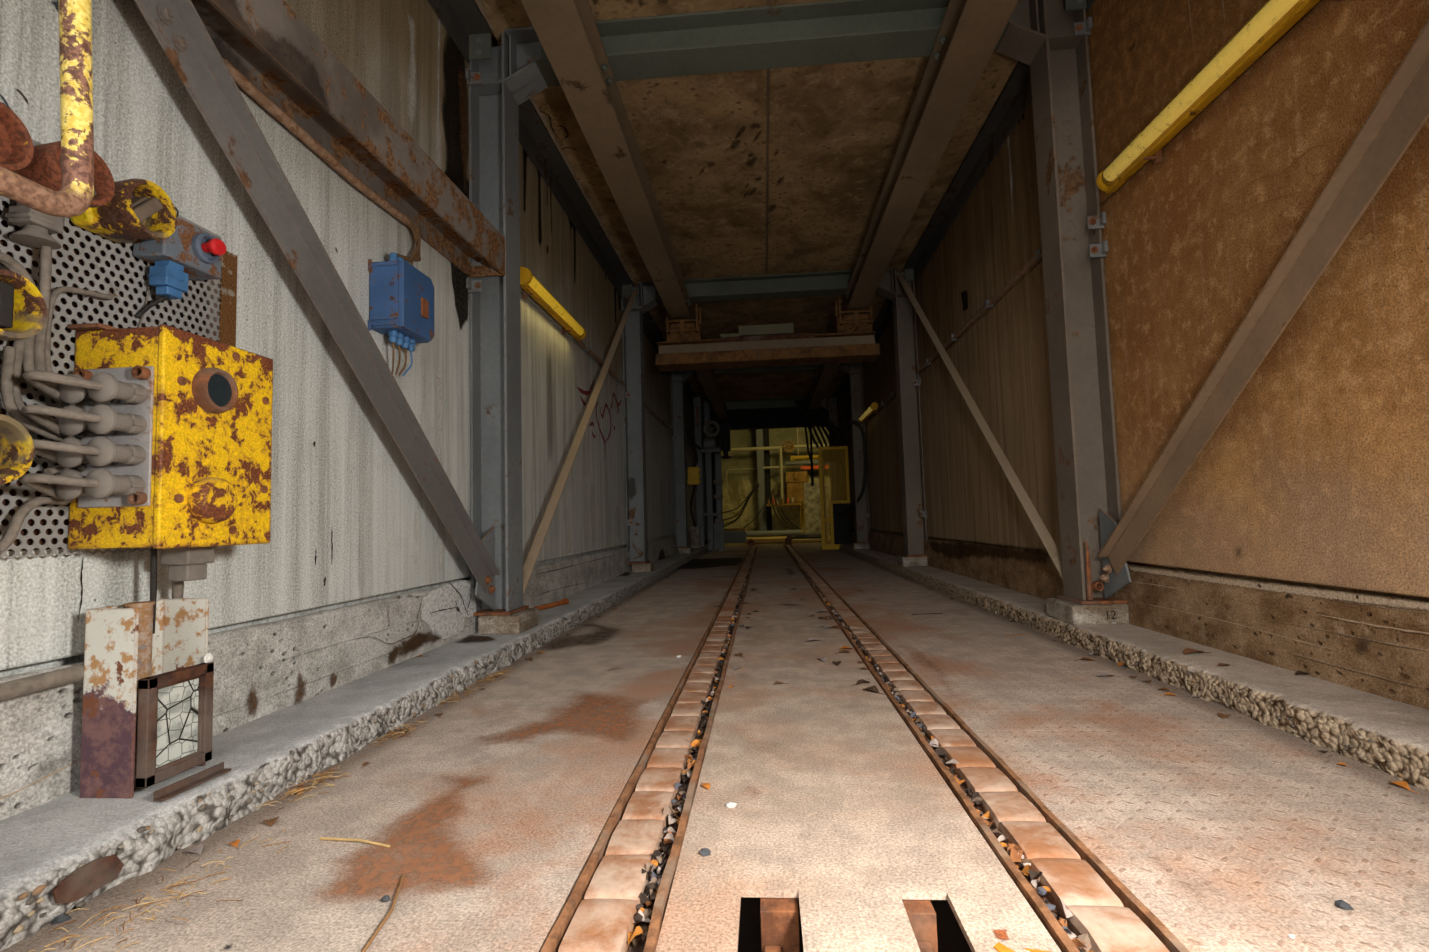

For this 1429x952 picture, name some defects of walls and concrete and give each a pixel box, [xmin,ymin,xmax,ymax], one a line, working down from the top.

water stain [435,20,469,199]
water stain [451,263,469,329]
rust [498,695,635,740]
rust [330,779,481,896]